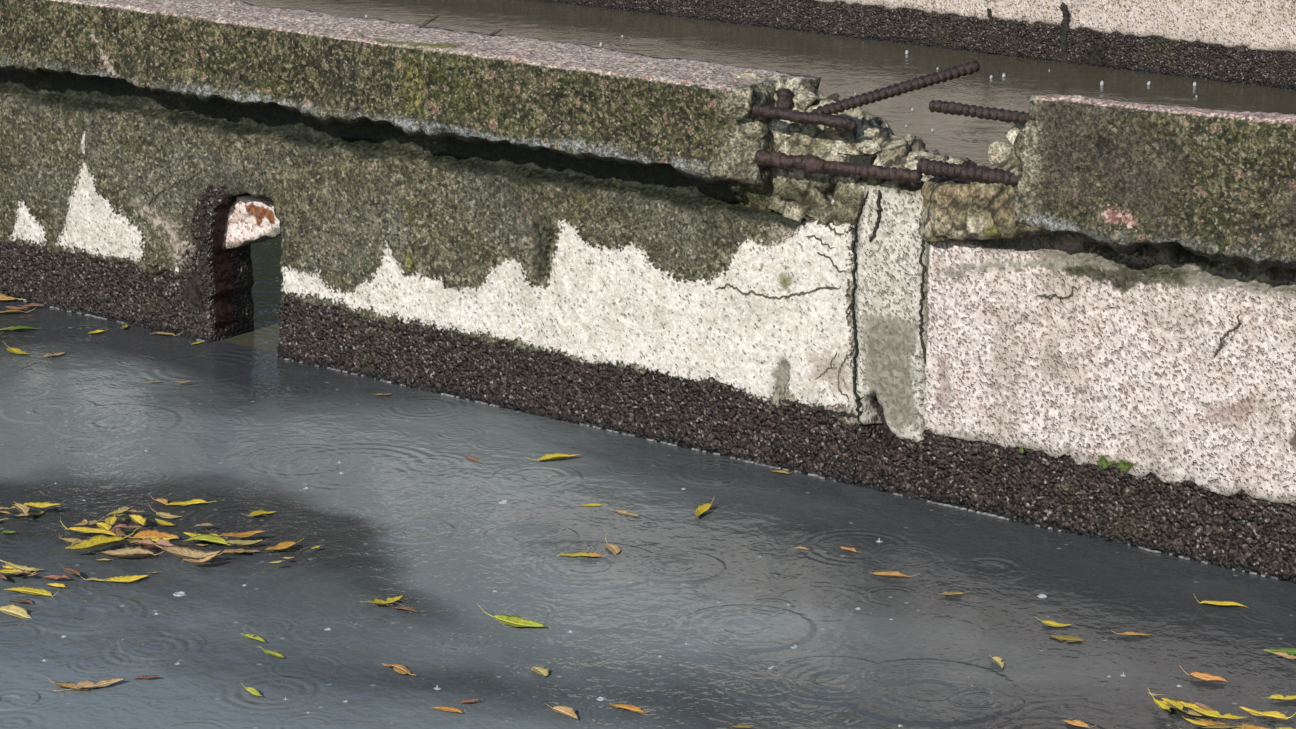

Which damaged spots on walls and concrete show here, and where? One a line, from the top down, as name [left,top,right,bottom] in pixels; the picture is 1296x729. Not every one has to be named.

peeling [8,163,145,262]
corrosion [212,203,274,334]
peeling [280,219,854,410]
crack [716,190,883,425]
crack [918,218,927,364]
spalling [870,396,896,445]